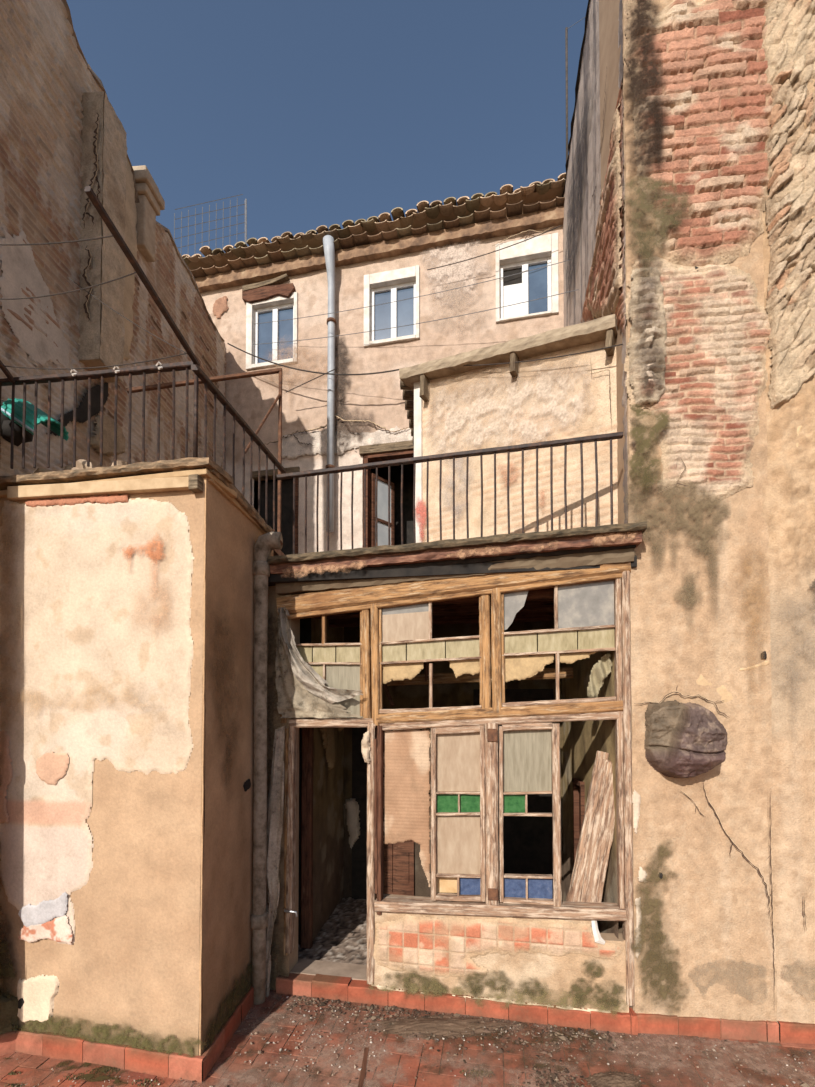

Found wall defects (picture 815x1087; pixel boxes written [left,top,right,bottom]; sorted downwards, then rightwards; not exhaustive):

crack [82,113,100,321]
flaking render [587,0,773,502]
peeling [0,494,194,945]
flaking render [17,974,60,1022]
crack [681,783,775,1010]